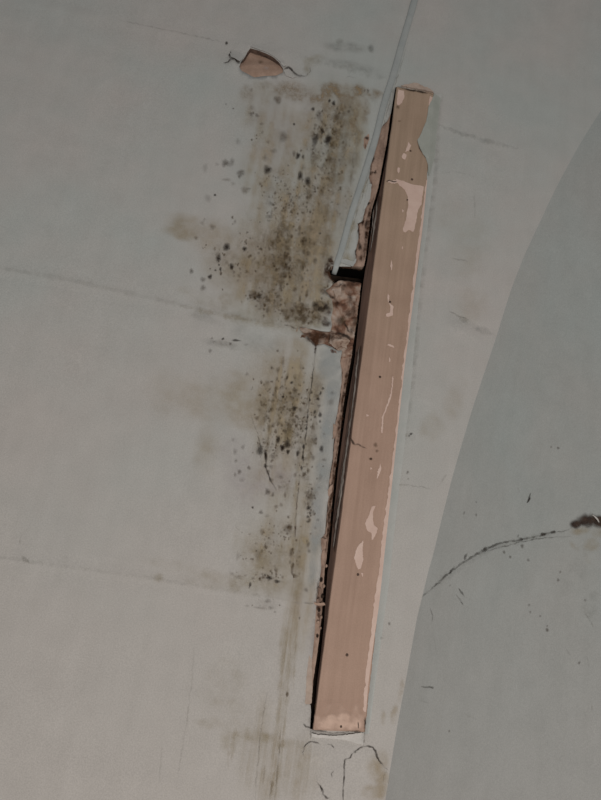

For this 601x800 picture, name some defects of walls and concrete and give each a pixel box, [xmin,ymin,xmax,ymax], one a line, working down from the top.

peeling [225,42,297,78]
damp [264,83,362,322]
damp [258,351,321,469]
spalling [296,114,427,712]
spalling [571,514,601,528]